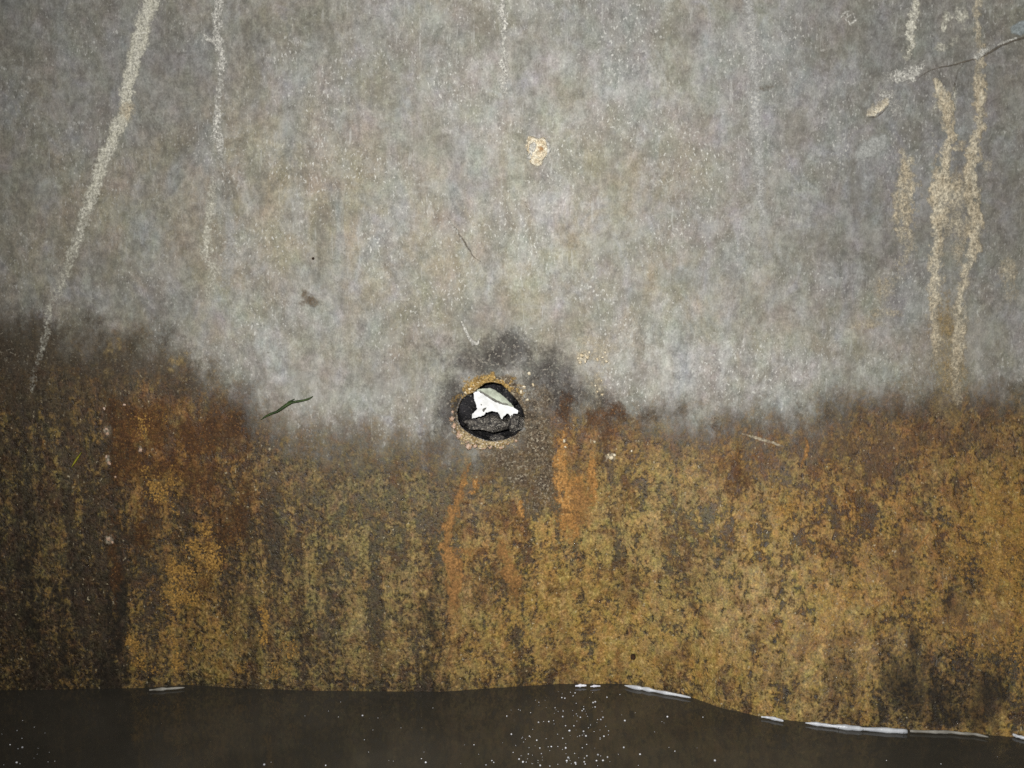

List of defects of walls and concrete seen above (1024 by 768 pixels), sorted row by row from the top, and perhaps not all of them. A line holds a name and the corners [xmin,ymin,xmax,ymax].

water stain [879,0,925,112]
water stain [941,9,969,32]
crack [943,37,1024,85]
water stain [54,0,160,291]
spalling [525,136,551,167]
water stain [893,152,922,239]
water stain [927,73,988,396]
rust [438,464,479,609]
spalling [448,371,555,514]
water stain [0,327,1024,737]
rust [552,396,607,542]